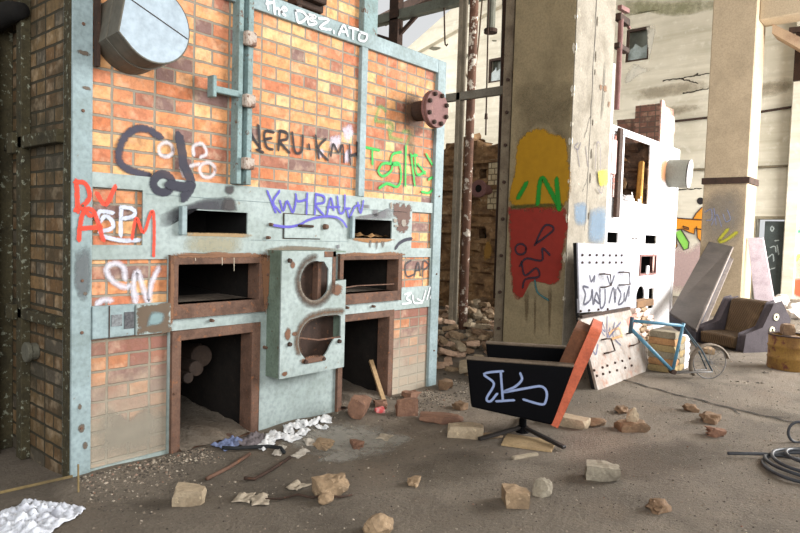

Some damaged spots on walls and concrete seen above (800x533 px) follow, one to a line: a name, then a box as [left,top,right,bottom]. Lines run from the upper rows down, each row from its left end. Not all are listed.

crack [663,73,710,94]
rust [136,233,405,335]